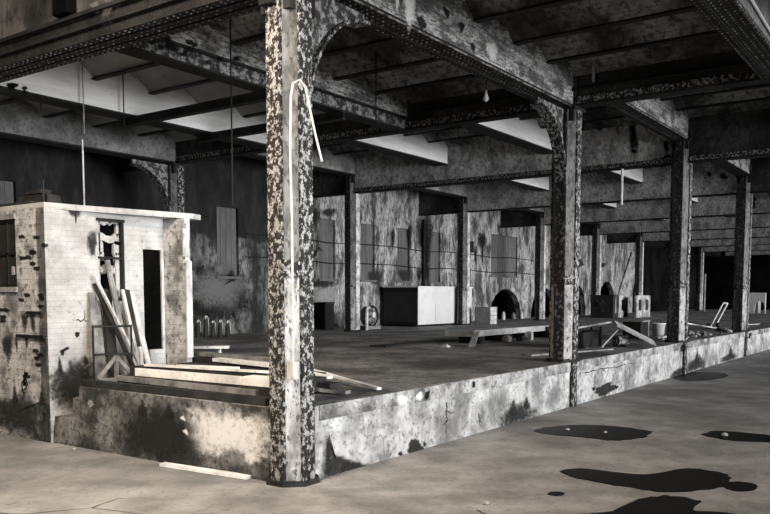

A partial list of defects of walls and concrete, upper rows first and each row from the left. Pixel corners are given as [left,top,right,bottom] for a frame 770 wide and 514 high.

peeling [486,42,497,61]
spalling [18,234,48,270]
water stain [0,356,93,442]
water stain [501,397,535,426]
water stain [321,437,367,478]
spalling [398,439,427,456]